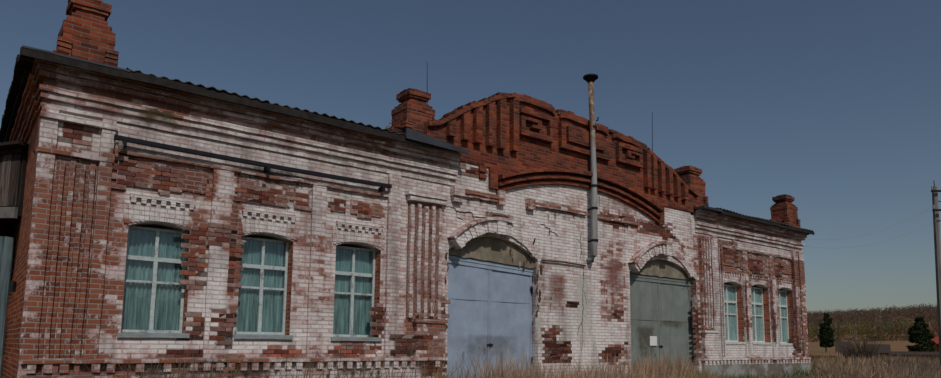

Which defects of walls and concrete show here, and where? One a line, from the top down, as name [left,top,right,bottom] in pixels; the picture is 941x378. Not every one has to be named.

peeling [57,122,99,147]
peeling [111,154,213,197]
crack [445,206,486,220]
peeling [179,222,246,292]
peeling [717,239,785,277]
spalling [506,248,543,317]
peeling [322,253,450,378]
peeling [601,304,624,322]
peeling [541,325,572,363]
peeling [598,342,628,365]
peeling [793,330,803,357]